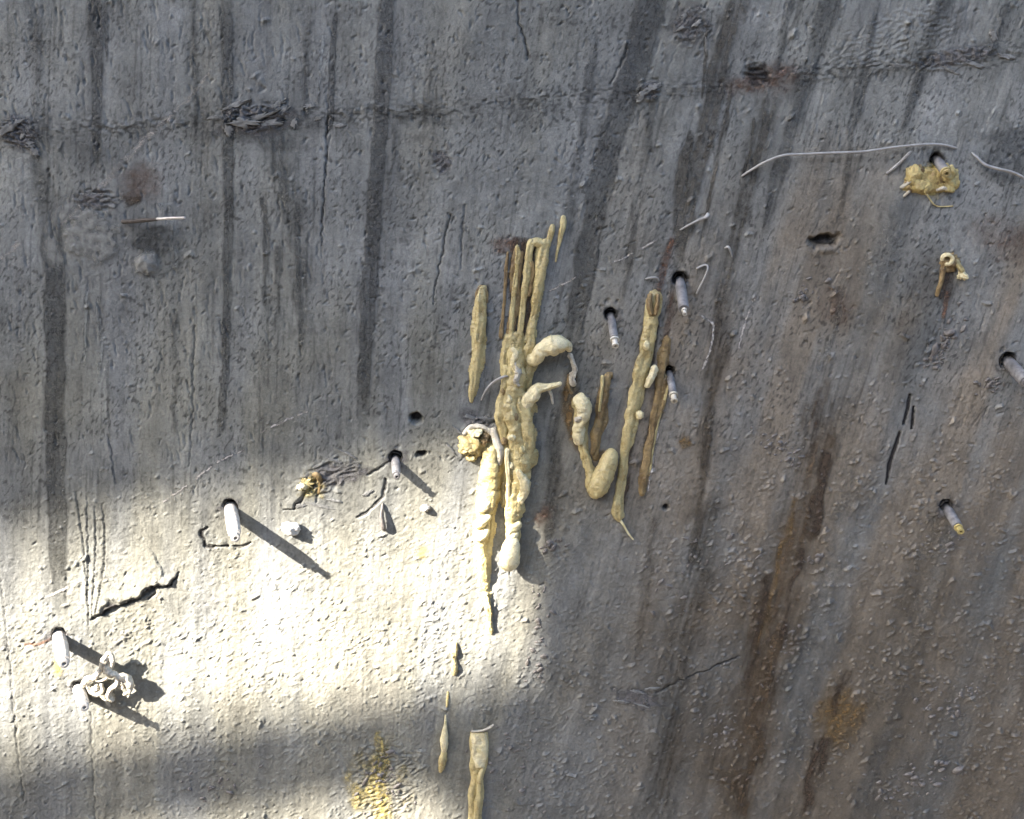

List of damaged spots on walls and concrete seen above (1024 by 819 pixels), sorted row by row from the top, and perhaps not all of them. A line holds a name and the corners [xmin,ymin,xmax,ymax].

spalling [205,98,345,137]
leakage [357,0,441,402]
leakage [41,230,67,590]
crack [92,573,179,619]
corrosion [724,391,835,814]
corrosion [802,674,867,815]